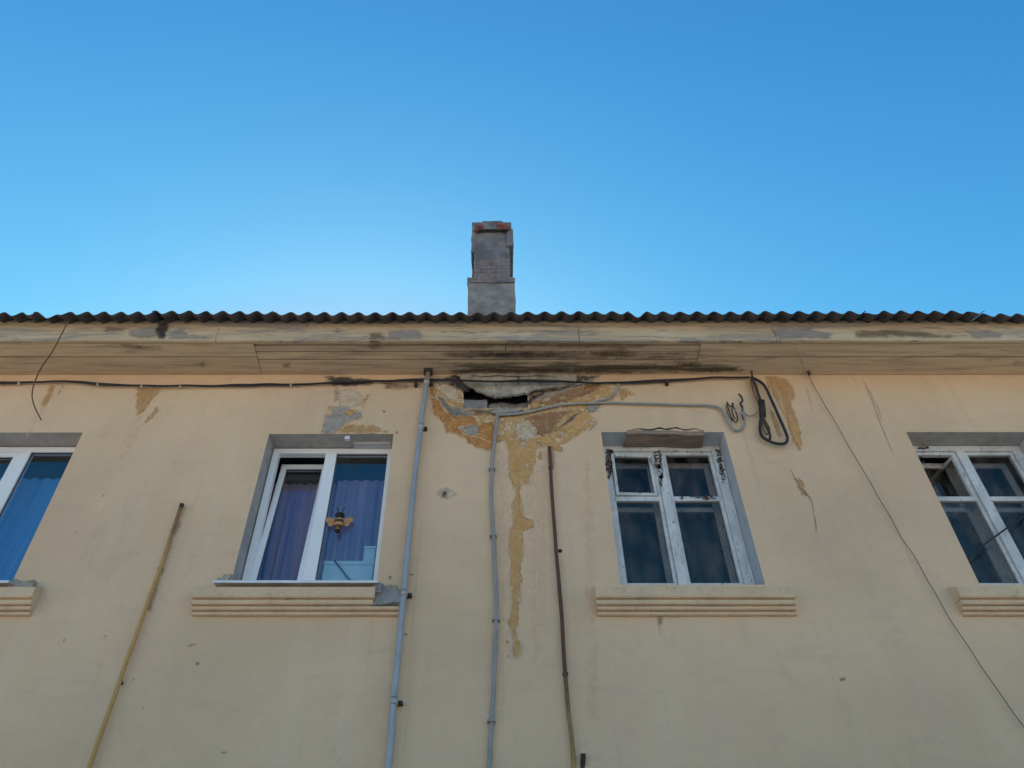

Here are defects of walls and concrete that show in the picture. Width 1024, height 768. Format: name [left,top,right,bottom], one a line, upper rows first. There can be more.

damp [444,344,736,391]
peeling [134,387,161,422]
peeling [321,388,387,434]
peeling [429,376,631,659]
crack [790,469,817,530]